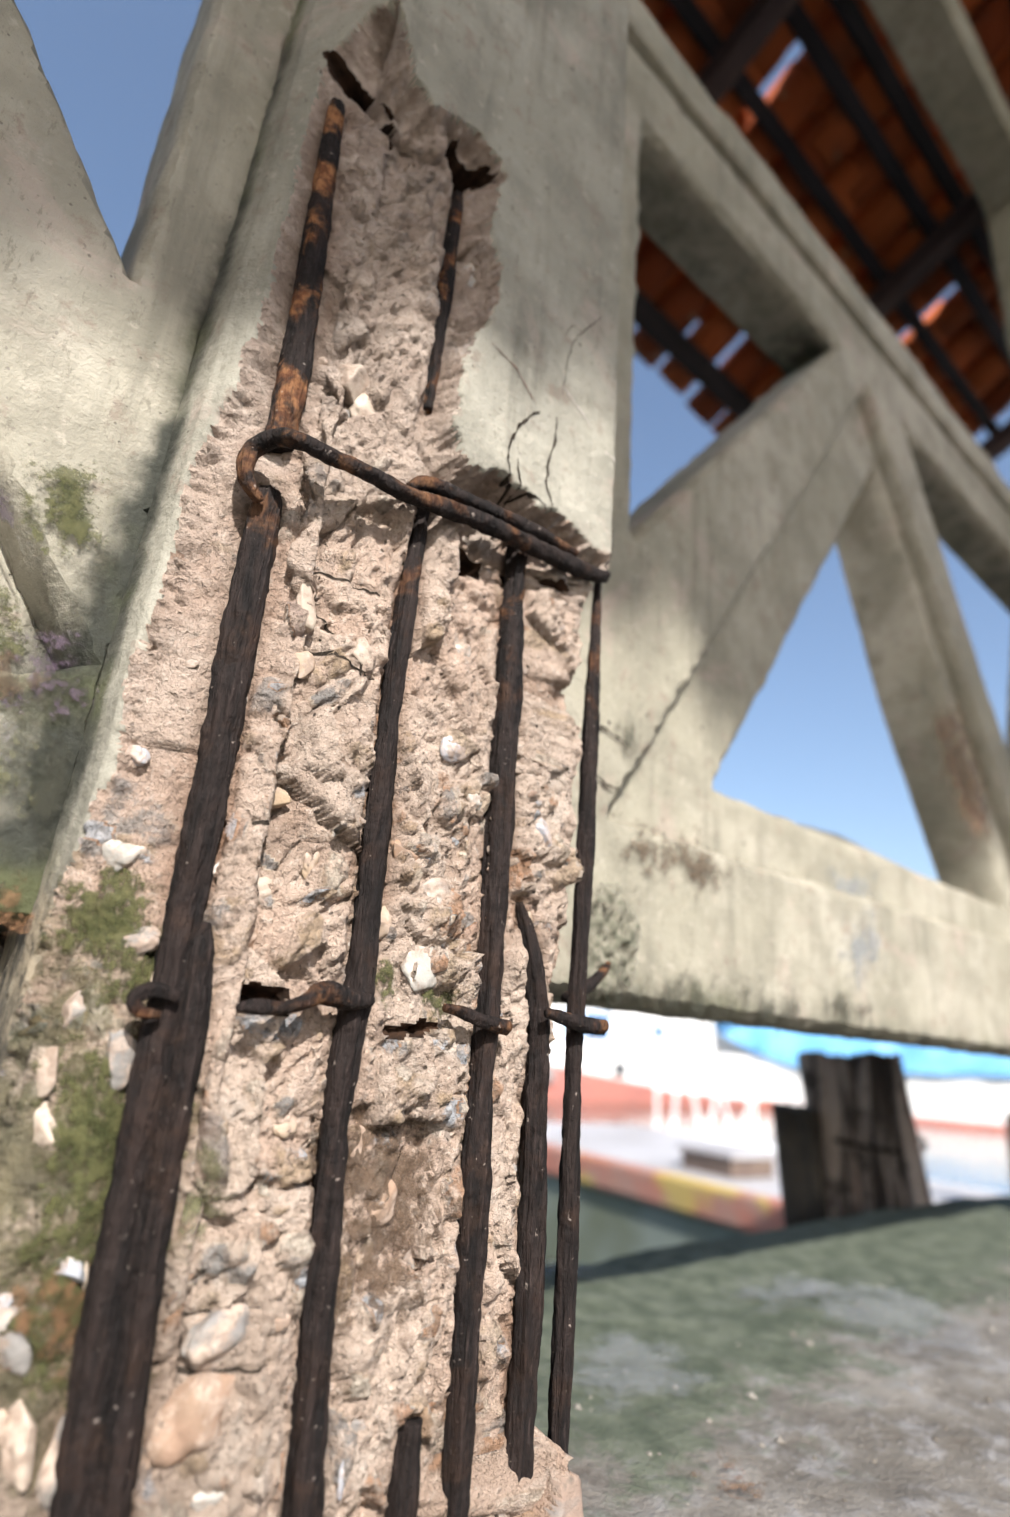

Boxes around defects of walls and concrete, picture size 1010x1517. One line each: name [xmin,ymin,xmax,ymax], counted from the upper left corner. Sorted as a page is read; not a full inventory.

spalling [0,0,611,1517]
crack [492,316,602,511]